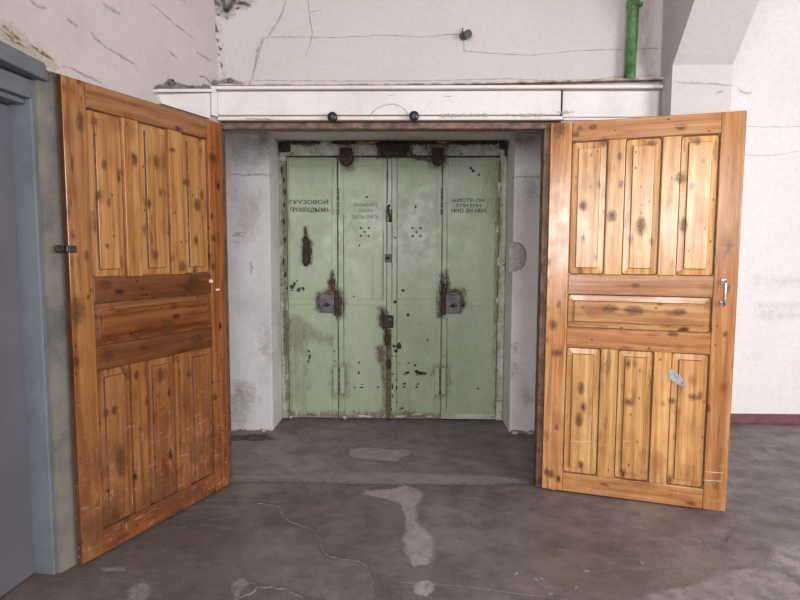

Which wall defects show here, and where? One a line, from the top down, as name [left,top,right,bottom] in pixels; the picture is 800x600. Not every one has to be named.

rust [315,215,345,338]
rust [377,230,390,414]
rust [436,272,465,318]
crack [234,581,305,600]
crack [257,503,375,600]